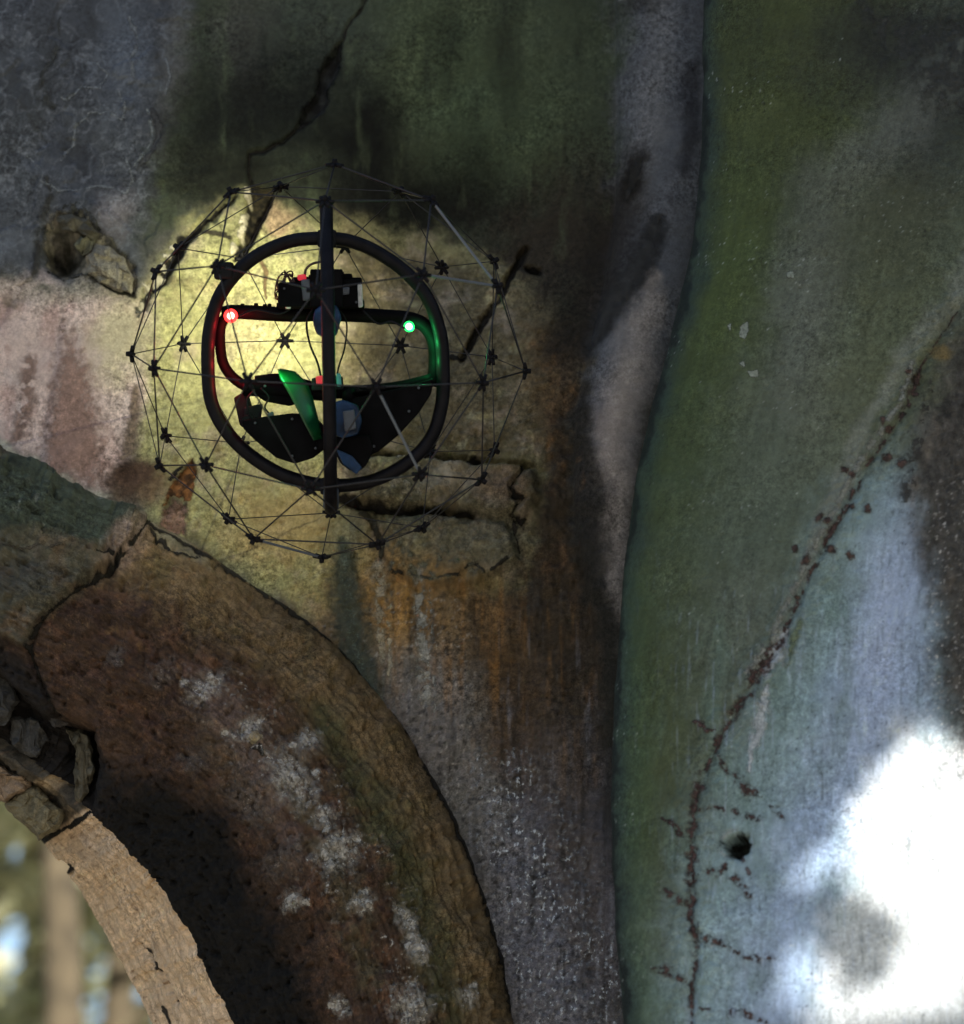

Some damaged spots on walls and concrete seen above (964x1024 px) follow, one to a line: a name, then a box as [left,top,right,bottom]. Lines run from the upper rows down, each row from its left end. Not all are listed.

spalling [26,108,164,298]
crack [135,0,367,318]
crack [450,246,527,362]
crack [24,520,370,714]
crack [339,493,474,561]
crack [427,456,484,466]
crack [508,466,530,554]
crack [396,717,511,1013]